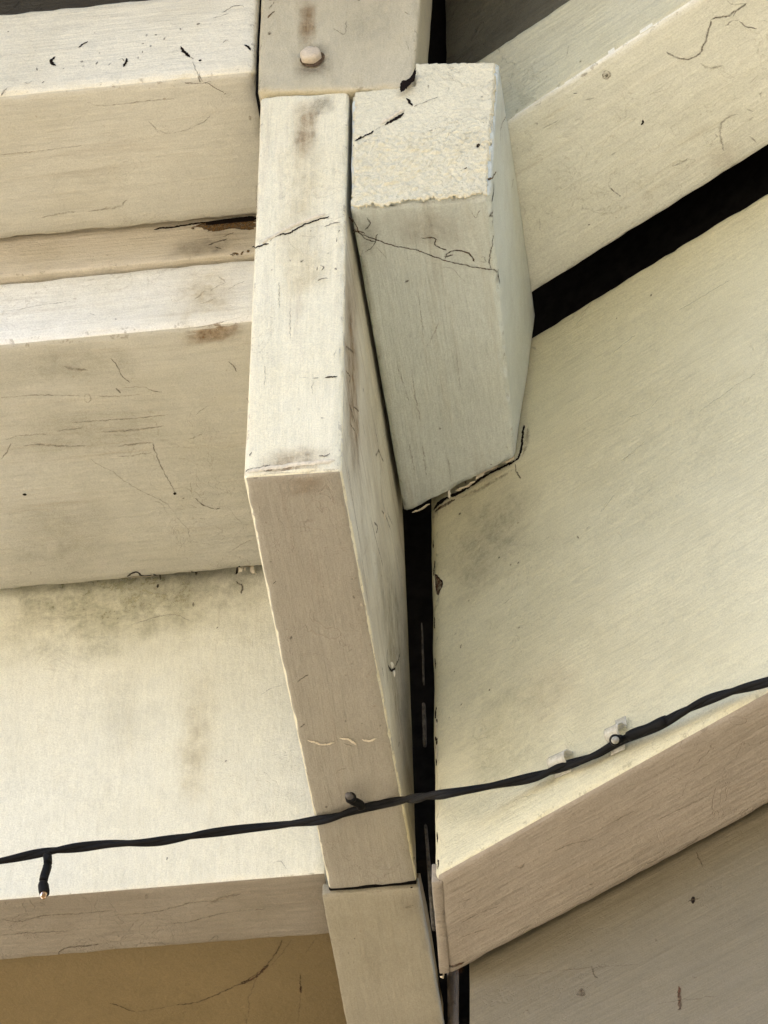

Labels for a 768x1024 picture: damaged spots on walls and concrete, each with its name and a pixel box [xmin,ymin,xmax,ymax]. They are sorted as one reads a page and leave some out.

crack [668,4,756,60]
spalling [400,68,416,106]
crack [252,172,500,282]
water stain [199,324,227,340]
water stain [85,575,190,624]
crack [178,940,282,1005]